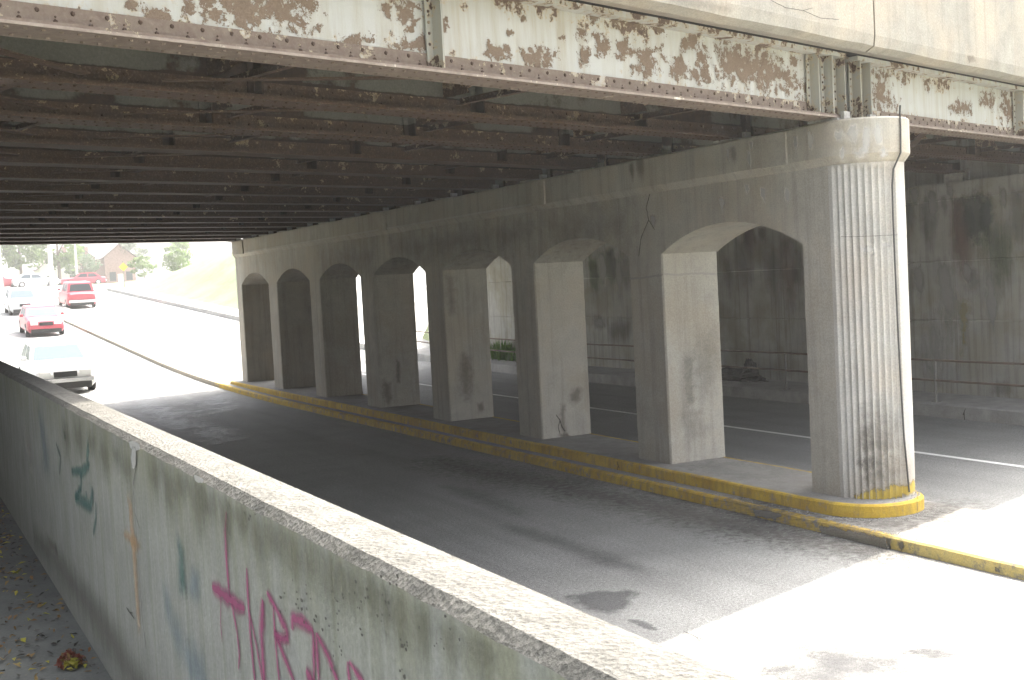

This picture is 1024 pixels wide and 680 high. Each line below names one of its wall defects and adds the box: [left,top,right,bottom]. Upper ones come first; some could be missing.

peeling [124,0,328,39]
peeling [336,0,426,53]
peeling [483,6,806,101]
peeling [871,67,907,112]
peeling [948,89,1013,128]